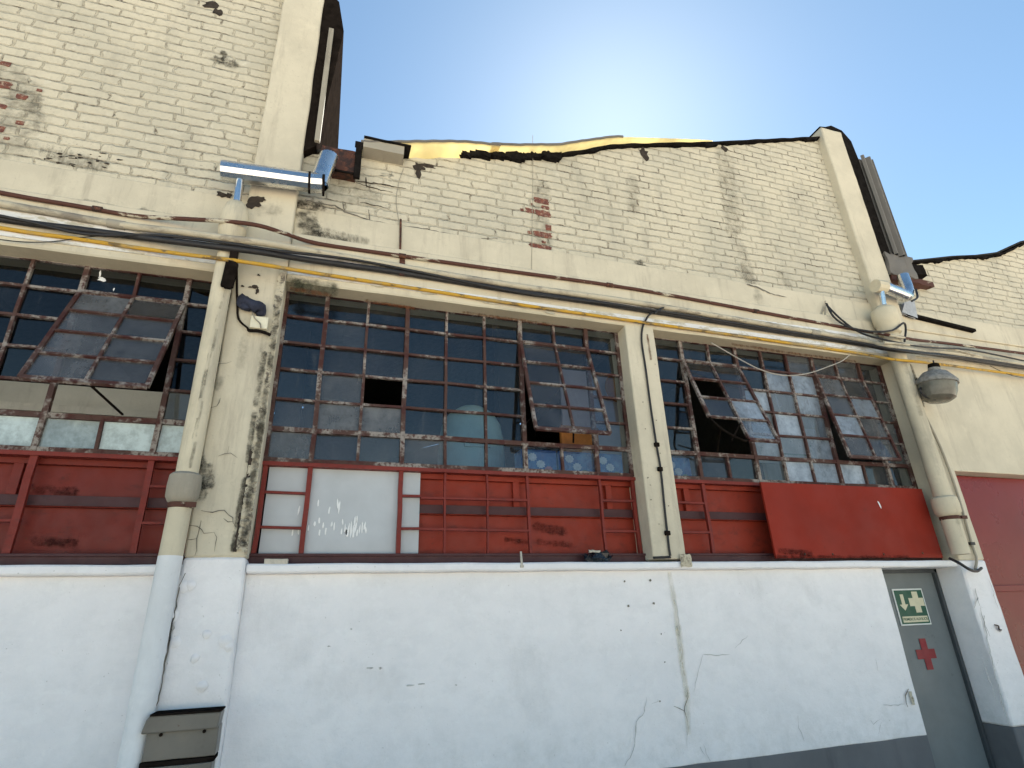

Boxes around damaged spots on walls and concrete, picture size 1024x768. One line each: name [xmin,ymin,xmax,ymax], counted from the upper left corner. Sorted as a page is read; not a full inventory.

spalling [202,1,223,16]
flaking render [0,81,42,109]
spalling [246,196,266,209]
damp [297,200,347,241]
crack [305,177,450,234]
flaking render [520,197,552,250]
damp [231,298,279,551]
crack [156,510,236,706]
crack [625,593,747,765]